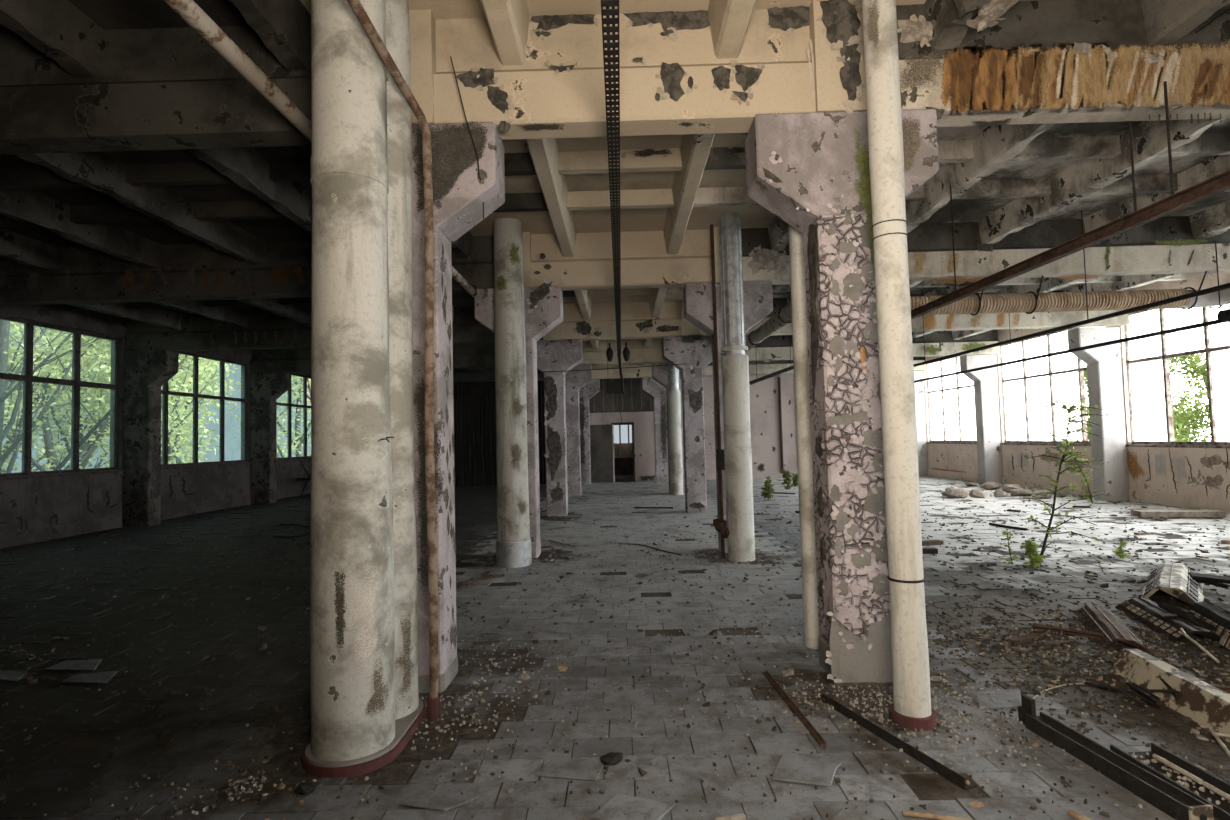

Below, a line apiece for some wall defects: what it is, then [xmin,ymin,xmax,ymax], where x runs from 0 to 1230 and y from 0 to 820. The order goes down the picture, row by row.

peeling [529,14,599,41]
peeling [624,10,710,42]
spalling [897,14,933,48]
spalling [966,0,1019,32]
spalling [456,66,565,133]
peeling [543,60,577,74]
spalling [655,62,698,102]
spalling [711,60,766,106]
spalling [760,0,881,114]
spalling [1073,42,1118,62]
peeling [544,376,563,502]
damp [333,562,382,697]